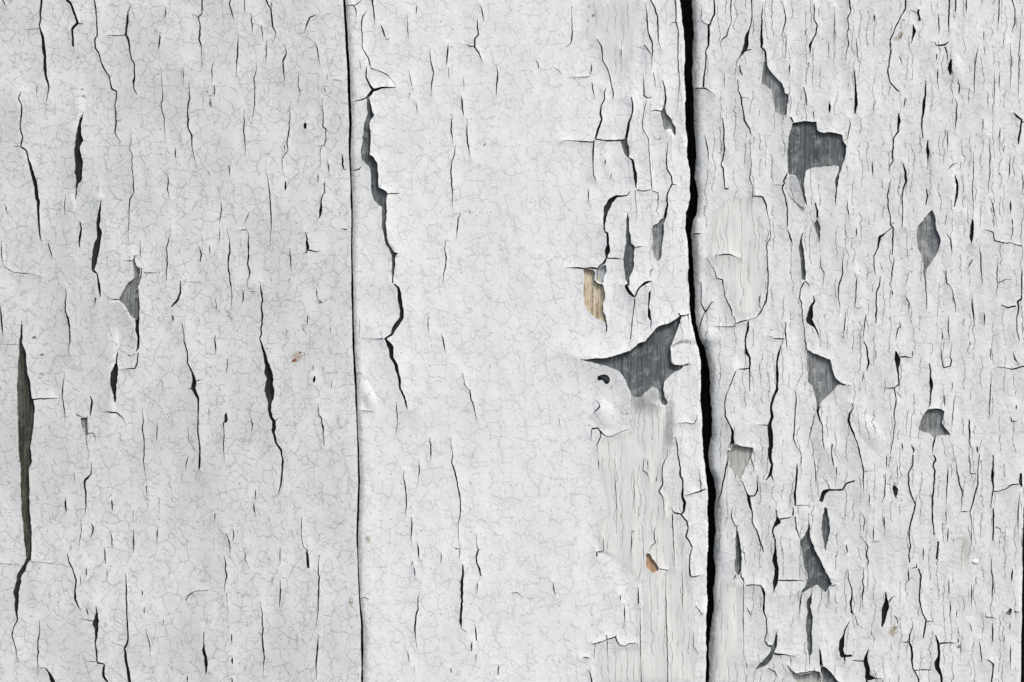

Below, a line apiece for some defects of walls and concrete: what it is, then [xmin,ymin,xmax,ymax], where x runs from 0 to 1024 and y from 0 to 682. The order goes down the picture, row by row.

crack [30,0,141,255]
crack [79,203,102,302]
crack [62,381,164,682]
crack [161,0,362,514]
peeling [354,66,408,409]
crack [403,438,499,675]
peeling [582,284,695,682]
crack [536,0,1024,682]
peeling [760,4,846,225]
peeling [799,520,834,612]
peeling [806,348,846,447]
peeling [917,210,940,307]